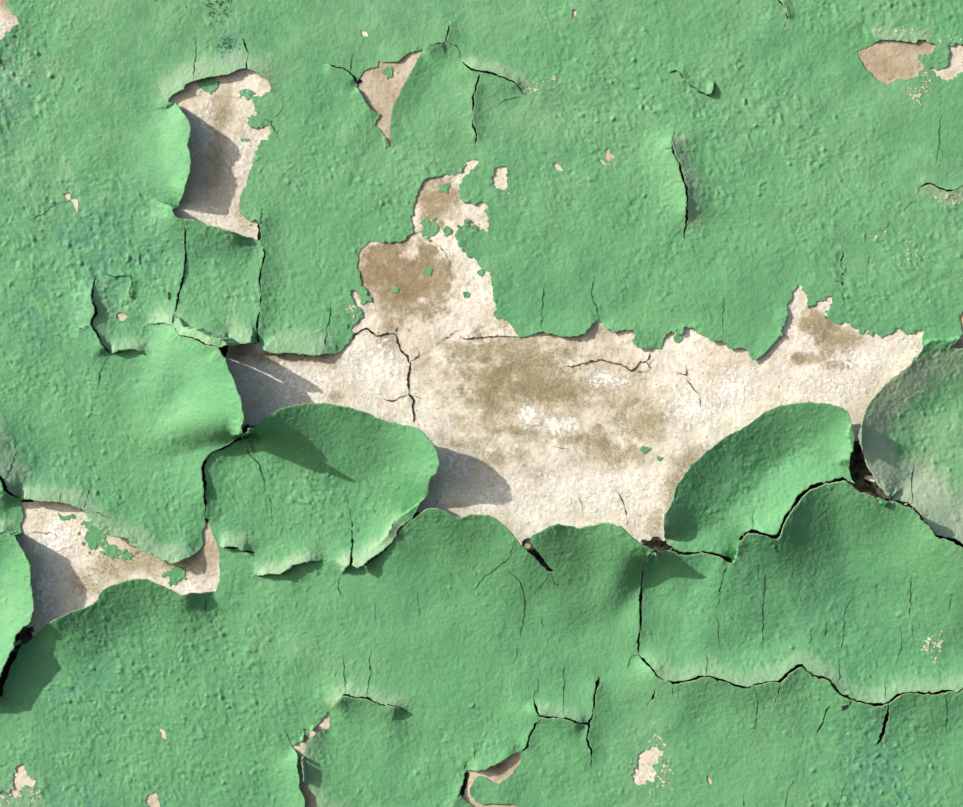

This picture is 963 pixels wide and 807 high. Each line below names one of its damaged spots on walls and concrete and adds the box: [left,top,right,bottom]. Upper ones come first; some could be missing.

peeling [128,38,284,240]
peeling [356,50,421,147]
crack [421,25,524,143]
peeling [857,39,963,84]
crack [323,302,520,421]
peeling [0,160,963,677]
damp [434,339,678,523]
damp [622,366,764,438]
crack [627,467,963,744]
crack [0,640,20,699]
peeling [272,695,529,807]
crack [522,667,600,768]